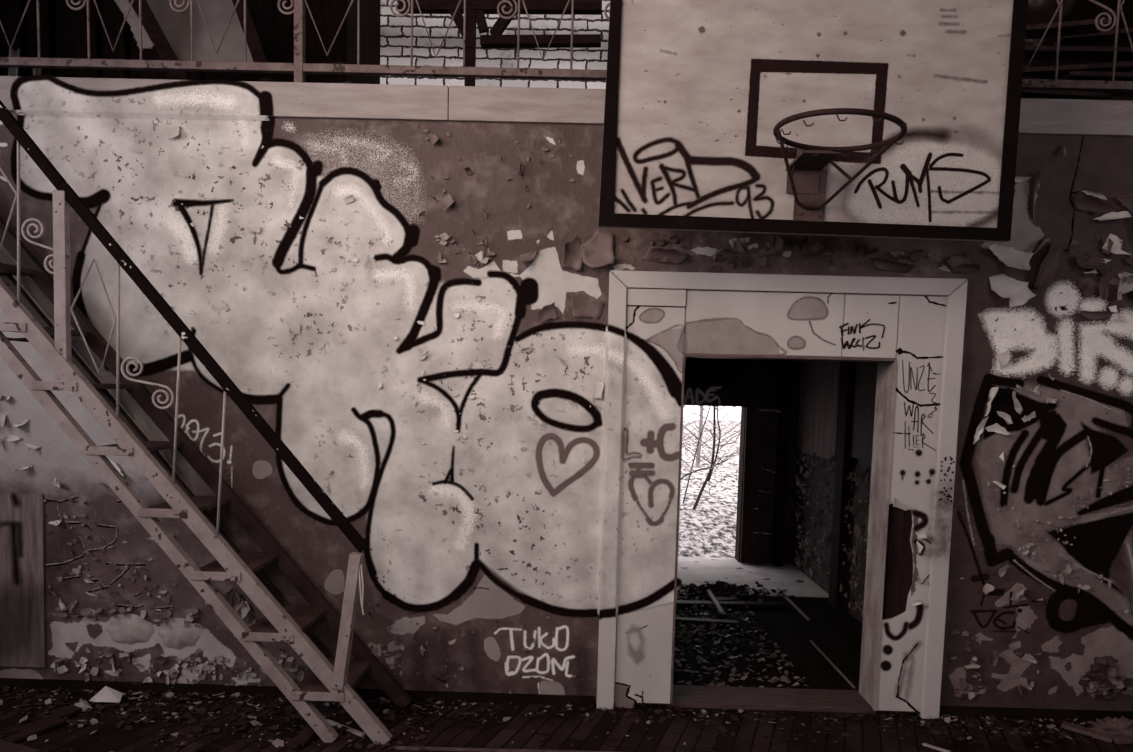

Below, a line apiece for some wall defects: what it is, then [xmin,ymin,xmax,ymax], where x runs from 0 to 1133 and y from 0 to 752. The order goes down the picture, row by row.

peeling [506,137,560,209]
spalling [569,155,585,182]
spalling [429,170,1133,322]
peeling [0,395,39,450]
peeling [973,373,1057,444]
peeling [988,462,1131,593]
spalling [0,601,270,691]
peeling [220,588,256,627]
spalling [948,565,1133,700]